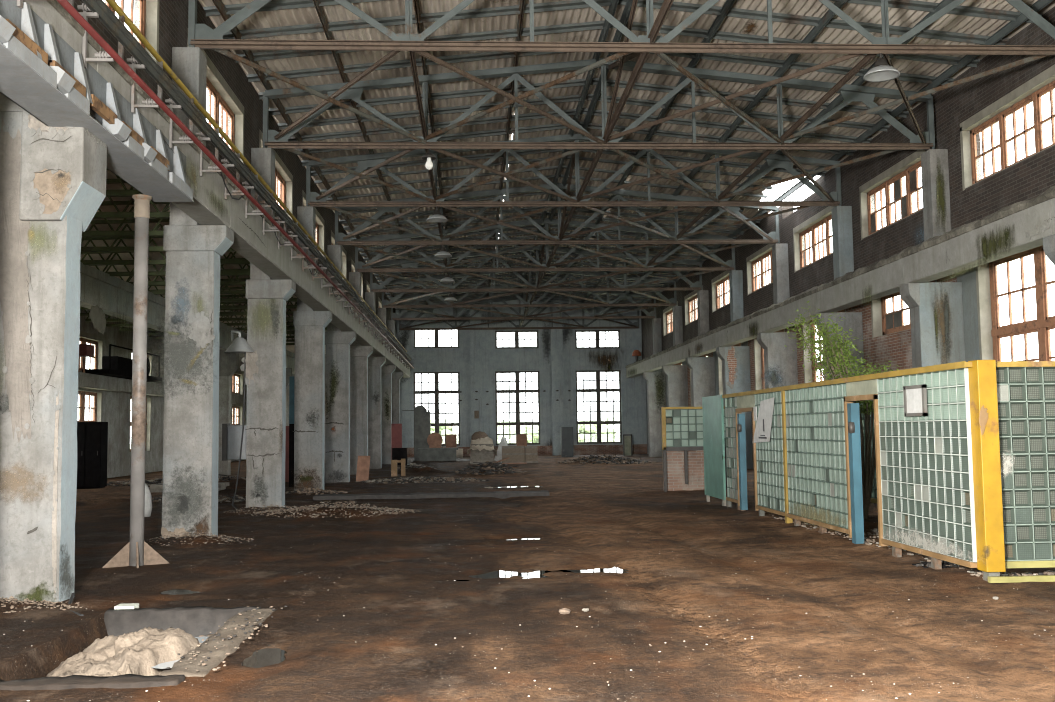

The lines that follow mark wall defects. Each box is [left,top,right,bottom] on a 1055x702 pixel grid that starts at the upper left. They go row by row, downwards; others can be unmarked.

flaking render [0,114,73,443]
damp [153,283,213,389]
damp [935,296,949,350]
crack [245,422,343,474]
damp [163,467,203,526]